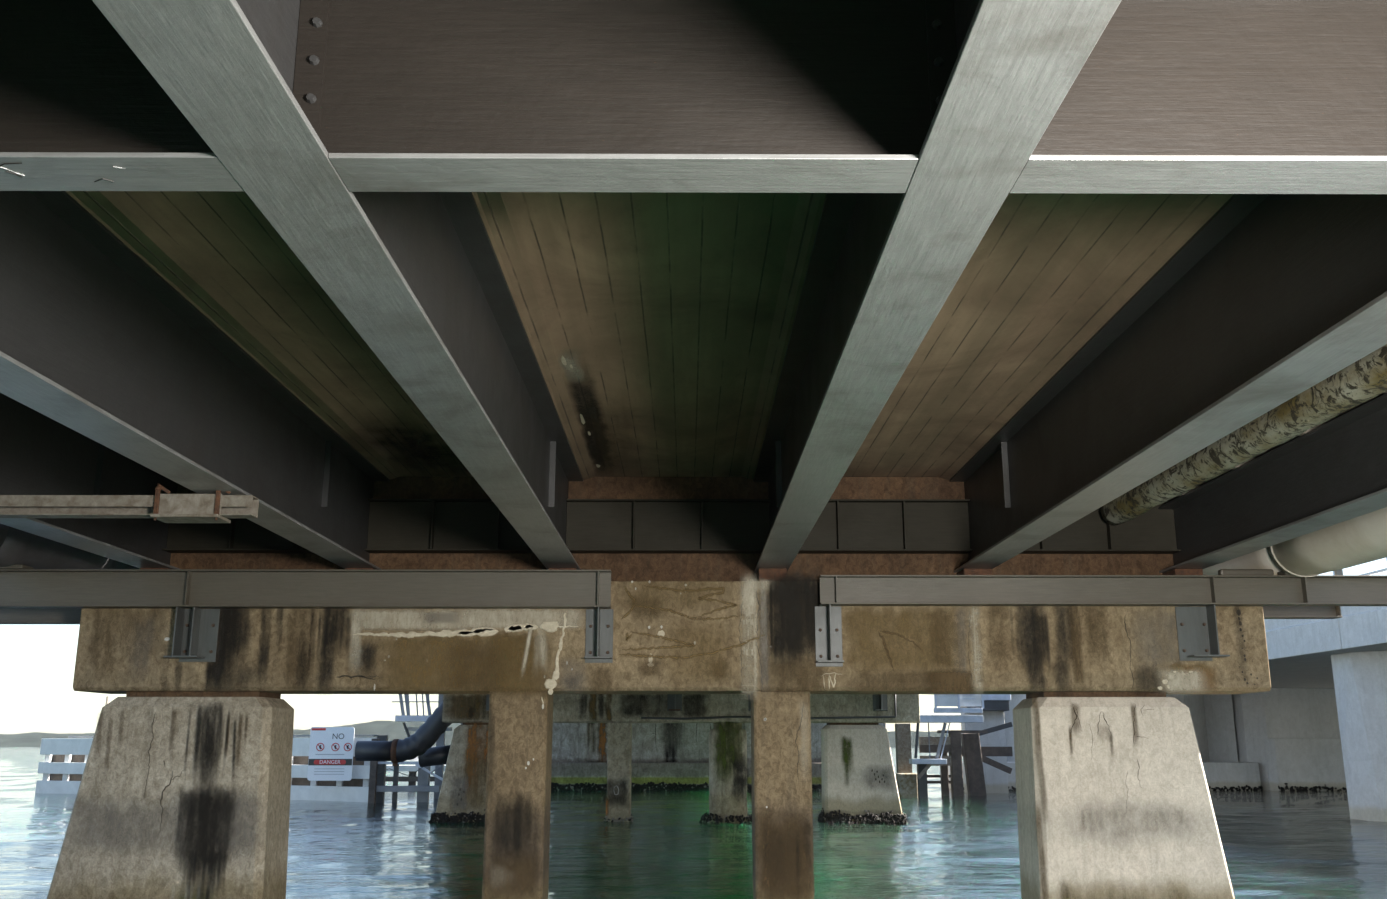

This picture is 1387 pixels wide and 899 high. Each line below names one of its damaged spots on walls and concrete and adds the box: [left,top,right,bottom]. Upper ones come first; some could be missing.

damp [573,375,620,466]
damp [206,608,346,688]
damp [357,630,544,691]
damp [753,573,820,690]
damp [991,606,1106,747]
damp [172,705,248,779]
damp [1069,707,1112,751]
damp [1037,783,1046,899]